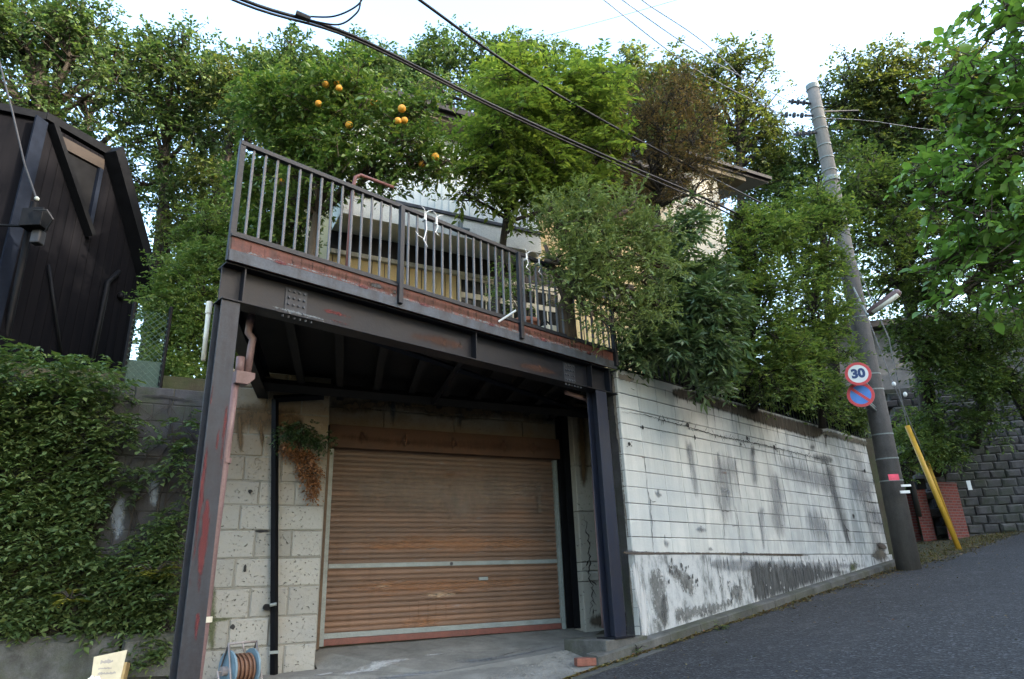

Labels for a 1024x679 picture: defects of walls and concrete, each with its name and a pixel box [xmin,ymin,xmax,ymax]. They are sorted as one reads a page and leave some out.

water stain [578,418,587,485]
water stain [665,388,867,538]
crack [584,520,596,614]
water stain [623,477,888,635]